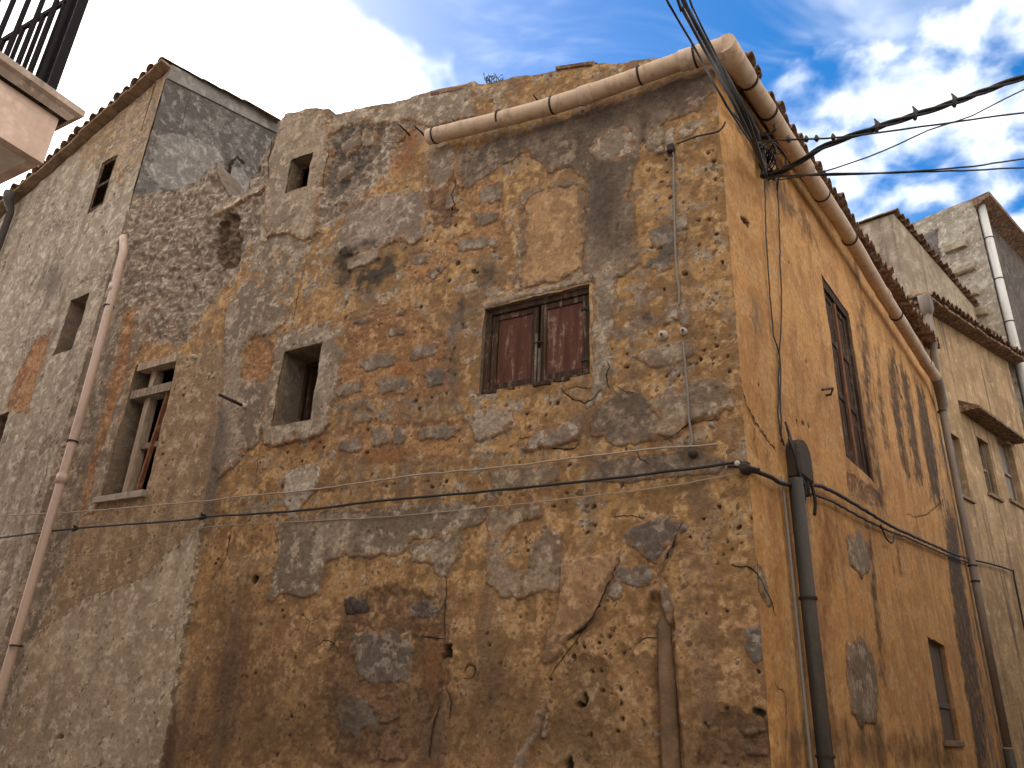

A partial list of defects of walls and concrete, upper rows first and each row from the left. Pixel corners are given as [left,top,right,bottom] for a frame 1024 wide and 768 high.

spalling [213,212,243,272]
crack [561,360,637,404]
water stain [861,343,988,768]
crack [551,565,617,675]
spalling [320,585,453,768]